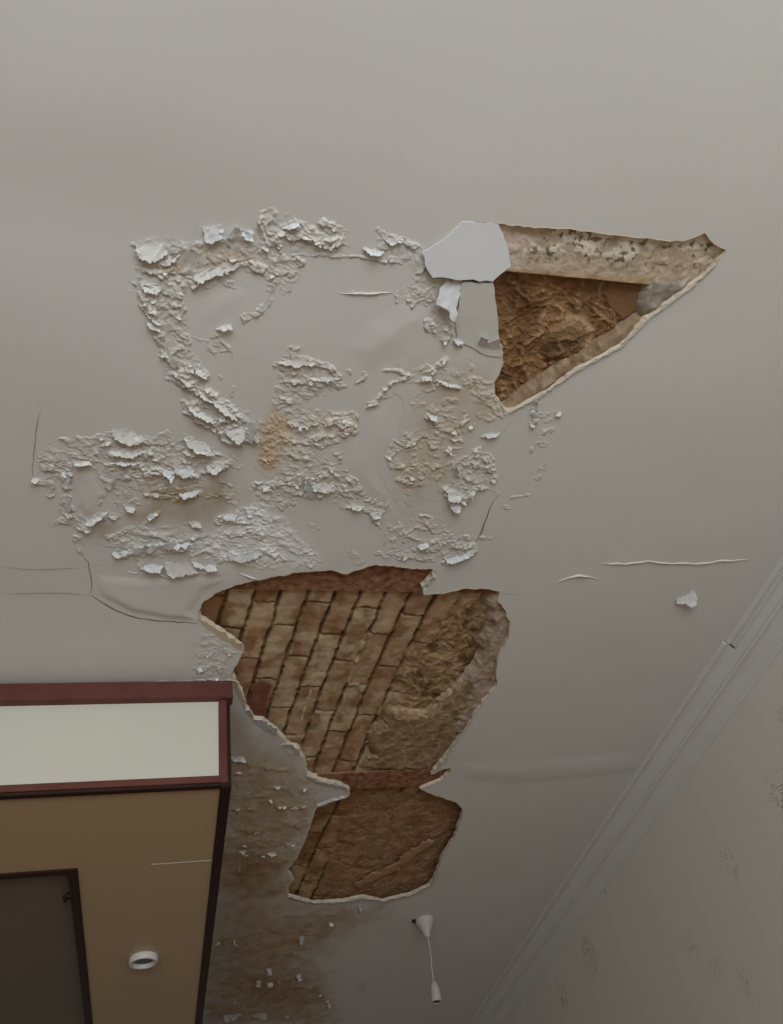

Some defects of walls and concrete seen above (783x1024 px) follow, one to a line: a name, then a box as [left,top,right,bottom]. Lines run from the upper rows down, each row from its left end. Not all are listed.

spalling [30,205,727,579]
crack [15,557,190,623]
spalling [147,345,530,912]